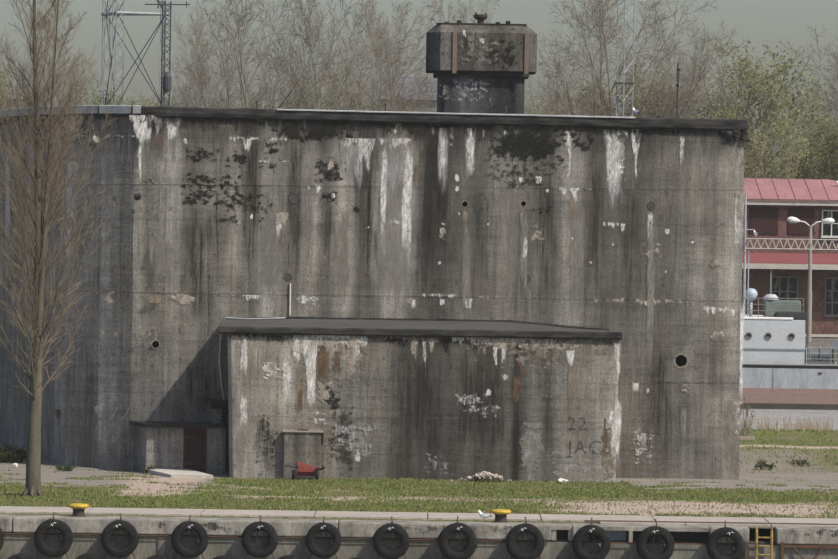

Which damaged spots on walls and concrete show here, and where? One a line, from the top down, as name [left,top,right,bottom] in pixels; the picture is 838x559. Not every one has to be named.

damp [130,115,180,178]
damp [466,128,474,171]
damp [599,129,640,203]
damp [341,126,459,300]
damp [422,211,472,308]
spalling [146,294,195,305]
damp [282,335,370,403]
rust [317,343,342,379]
damp [452,337,620,398]
damp [334,422,376,461]
rust [601,428,611,456]
damp [608,401,621,460]